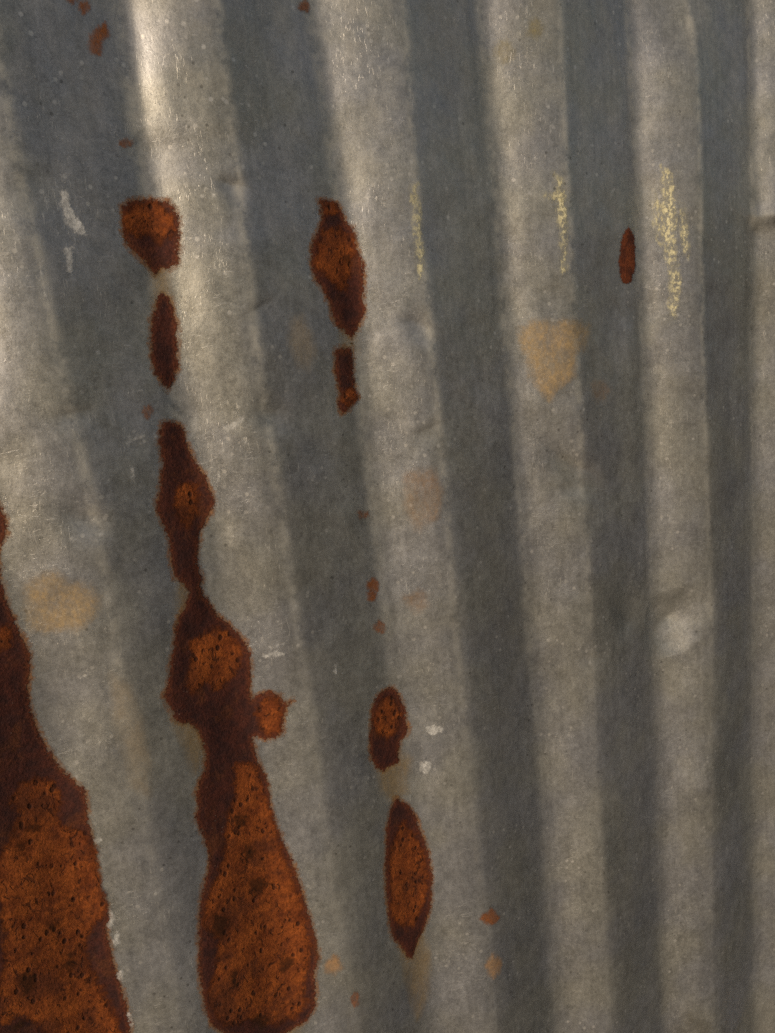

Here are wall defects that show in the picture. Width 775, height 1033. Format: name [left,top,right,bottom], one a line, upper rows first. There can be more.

corrosion [119,196,182,278]
corrosion [147,291,181,389]
corrosion [309,197,367,416]
corrosion [618,227,636,284]
corrosion [0,506,134,1033]
corrosion [155,419,339,1033]
corrosion [368,687,412,773]
corrosion [383,795,434,959]